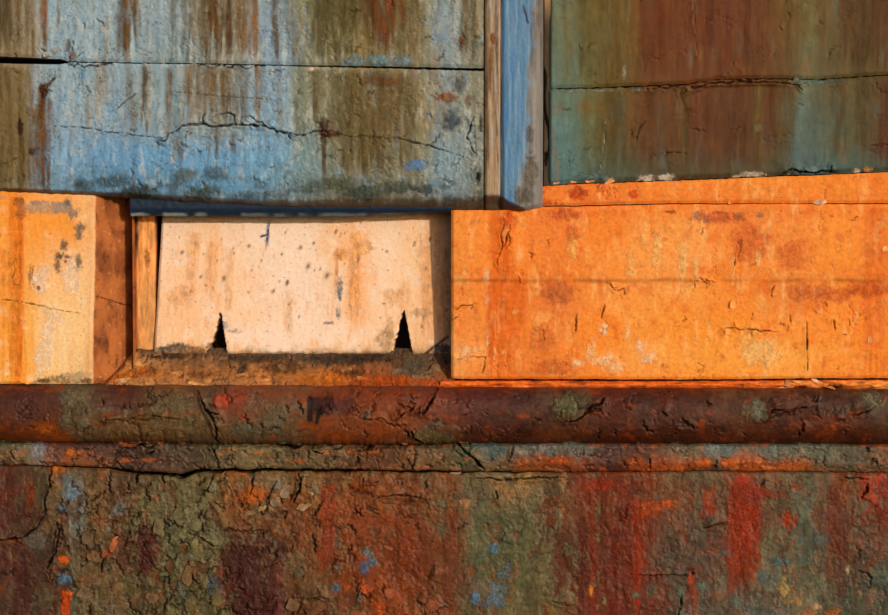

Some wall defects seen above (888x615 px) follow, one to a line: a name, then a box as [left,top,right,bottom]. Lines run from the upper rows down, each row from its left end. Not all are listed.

crack [642,80,805,94]
crack [55,98,316,142]
leakage [307,70,432,201]
leakage [76,177,157,198]
leakage [180,169,222,200]
rust [307,396,355,424]
peeling [741,379,842,421]
rust [695,458,739,468]
peeling [52,466,81,512]
peeling [232,473,290,516]
crack [0,469,60,574]
rust [726,482,779,597]